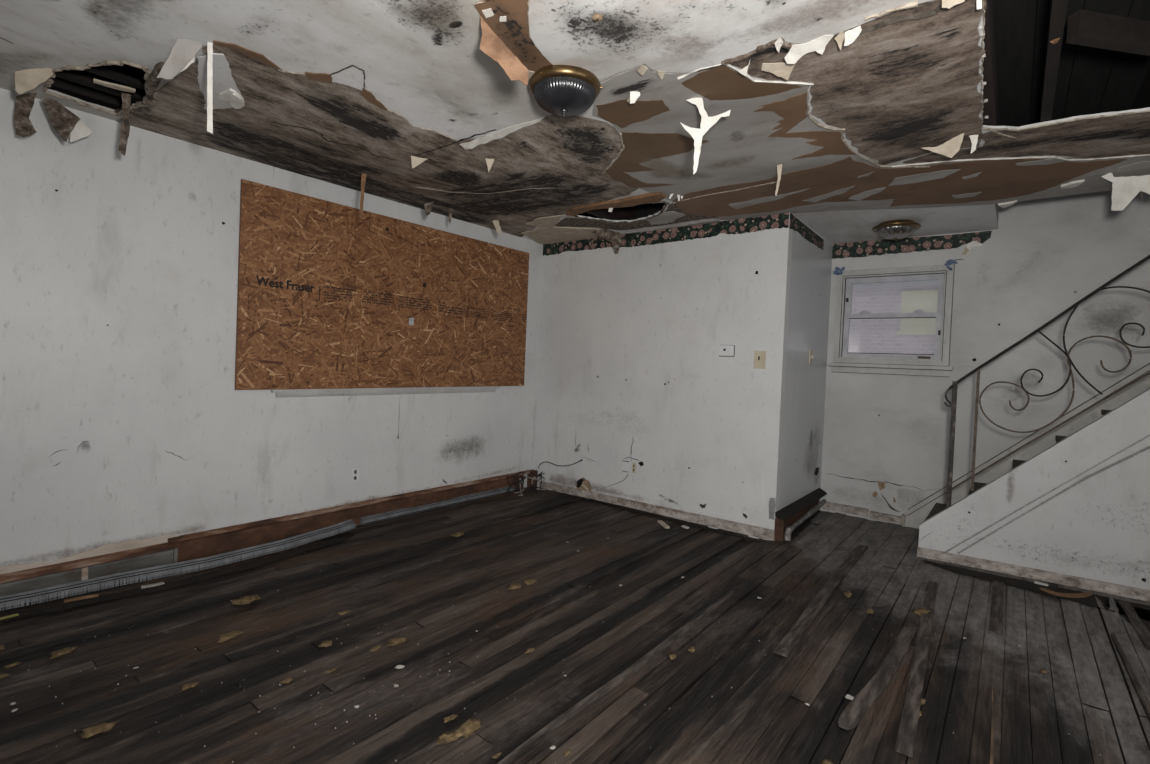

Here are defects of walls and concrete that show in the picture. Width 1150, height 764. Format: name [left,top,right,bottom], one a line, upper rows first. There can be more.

leakage [117,45,638,237]
mould [380,0,464,45]
peeling [473,0,552,85]
mould [552,2,675,59]
peeling [566,25,1150,220]
leakage [730,0,1150,165]
peeling [961,241,983,256]